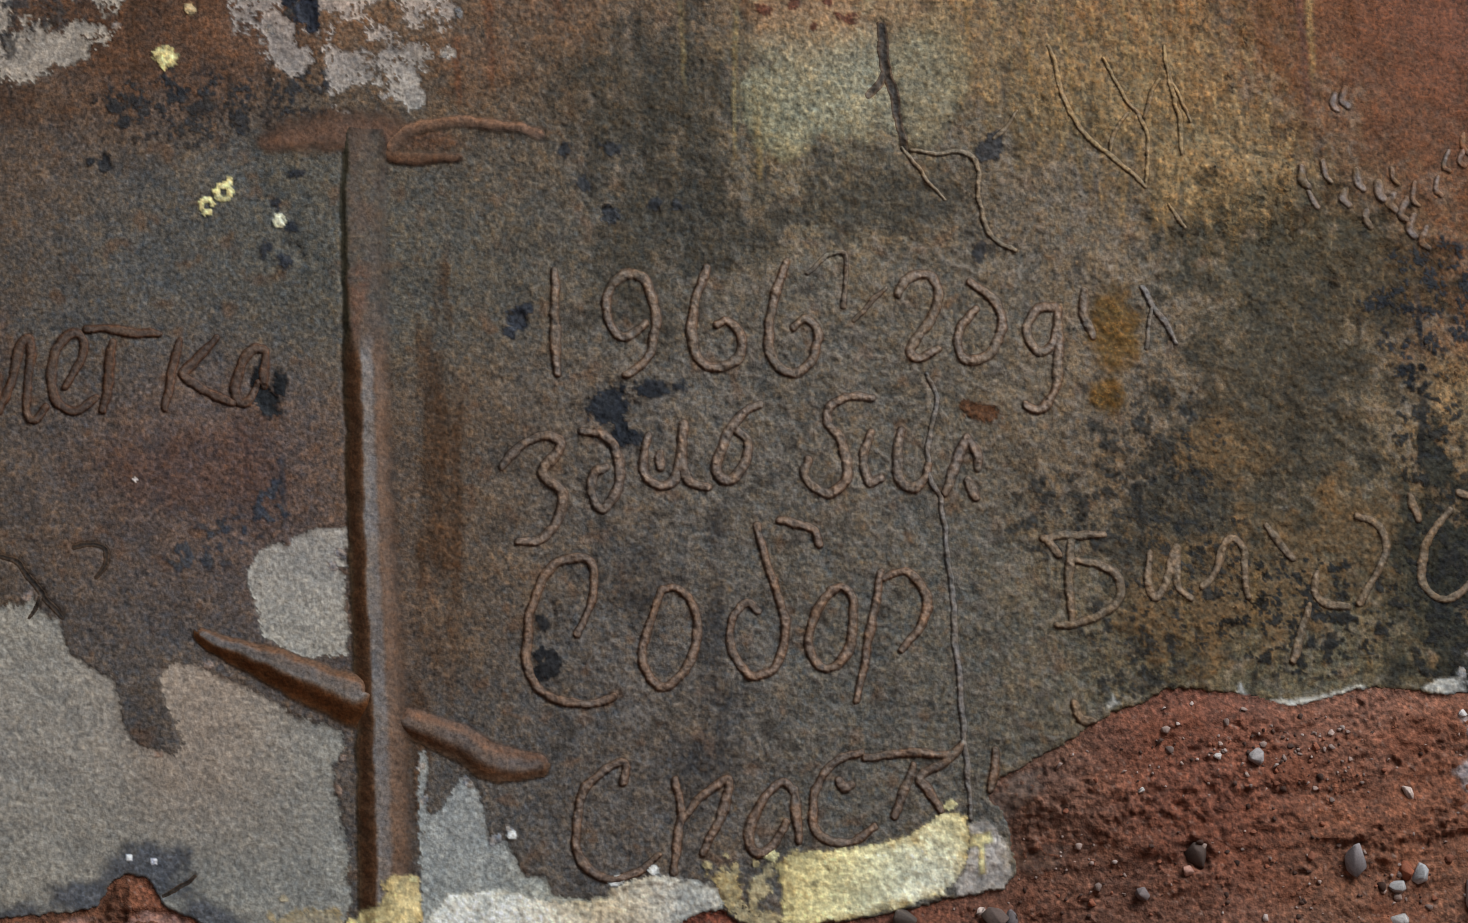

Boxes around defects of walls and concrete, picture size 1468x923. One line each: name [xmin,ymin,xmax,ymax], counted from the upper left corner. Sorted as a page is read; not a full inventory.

peeling [0,0,124,87]
peeling [227,0,463,114]
crack [865,21,1018,253]
corrosion [1252,0,1468,222]
water stain [573,0,1468,708]
peeling [0,591,353,923]
peeling [247,526,352,660]
peeling [416,750,610,923]
spalling [532,614,562,681]
spalling [680,901,737,923]
crack [924,372,973,821]
spalling [828,652,1468,923]